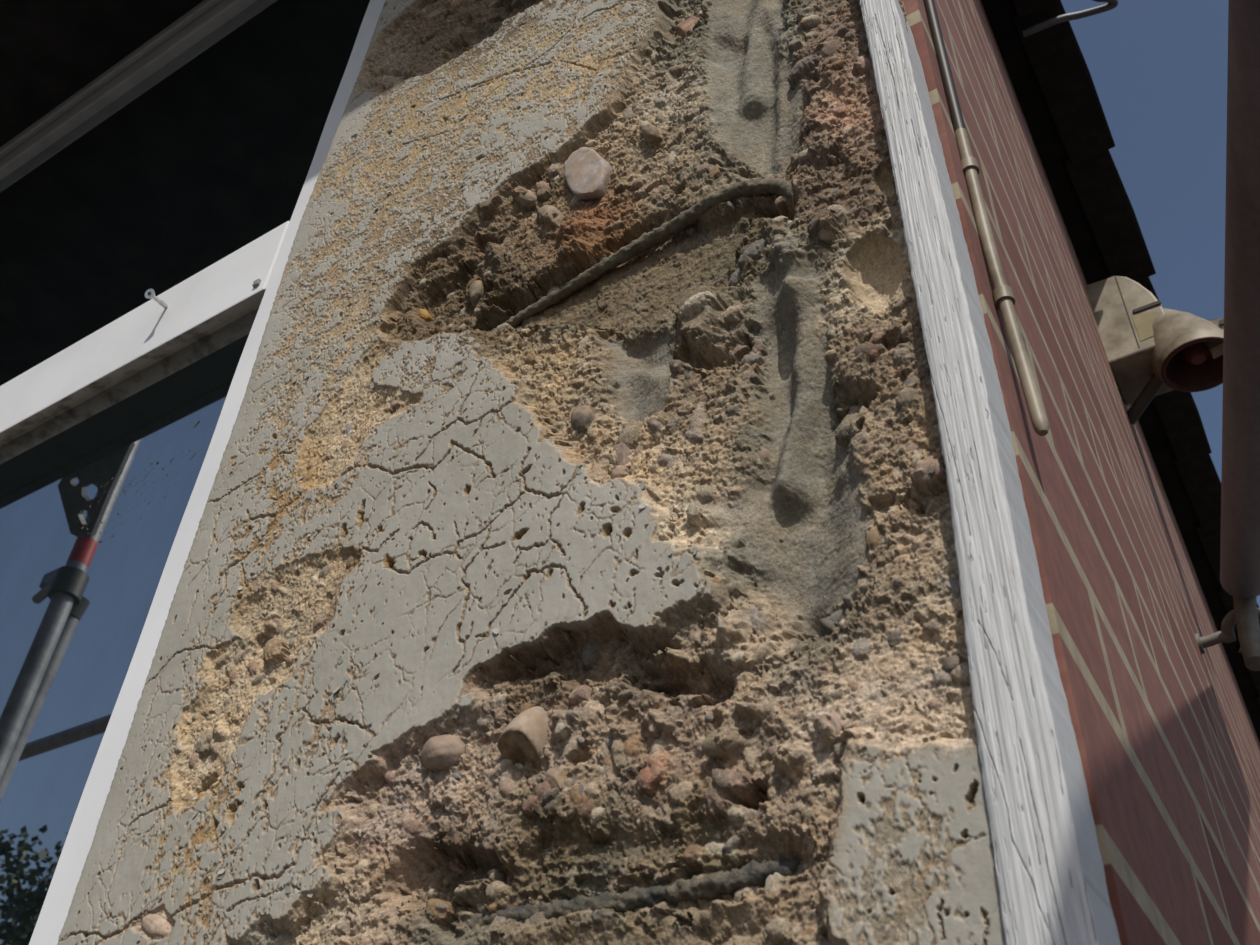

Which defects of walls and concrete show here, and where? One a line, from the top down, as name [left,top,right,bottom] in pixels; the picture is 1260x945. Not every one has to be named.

crack [58,450,341,945]
crack [254,636,372,801]
crack [340,323,588,674]
spalling [63,0,994,945]